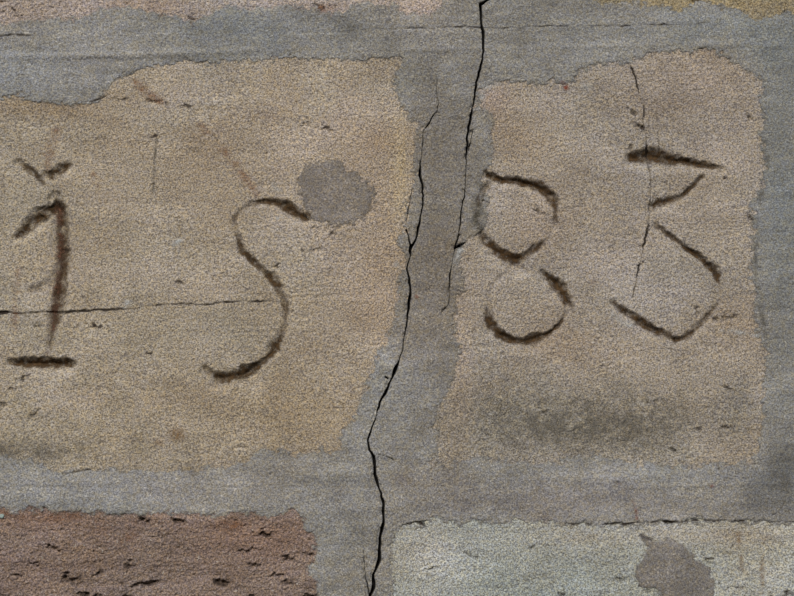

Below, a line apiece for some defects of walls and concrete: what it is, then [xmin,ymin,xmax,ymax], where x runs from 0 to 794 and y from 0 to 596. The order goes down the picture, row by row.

crack [444,0,489,164]
crack [0,301,234,315]
crack [365,113,436,596]
crack [449,190,465,287]